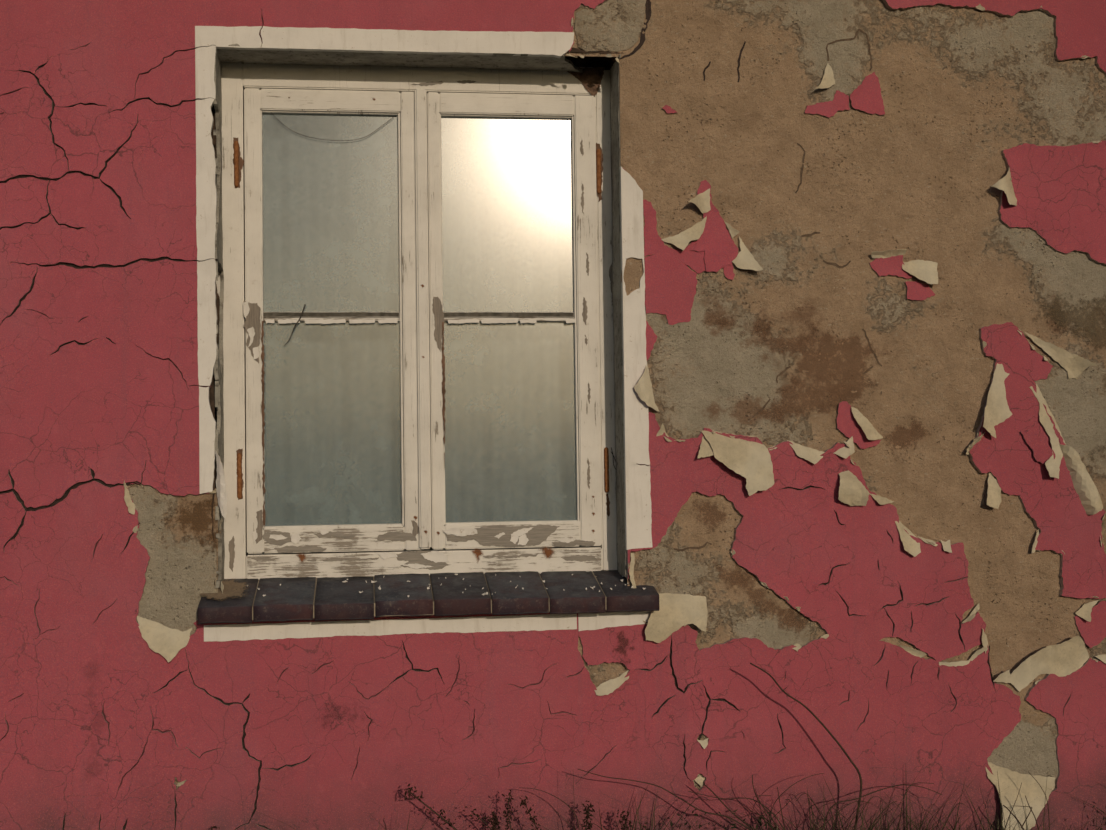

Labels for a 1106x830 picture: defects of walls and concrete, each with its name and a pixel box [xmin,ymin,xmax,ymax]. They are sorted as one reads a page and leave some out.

crack [0,48,203,230]
crack [1,257,217,324]
crack [52,317,211,390]
peeling [243,297,597,570]
peeling [565,0,1106,830]
peeling [124,451,244,662]
crack [99,650,313,830]
crack [351,641,475,779]
crack [511,663,583,715]
crack [641,639,744,781]
crack [820,562,993,701]